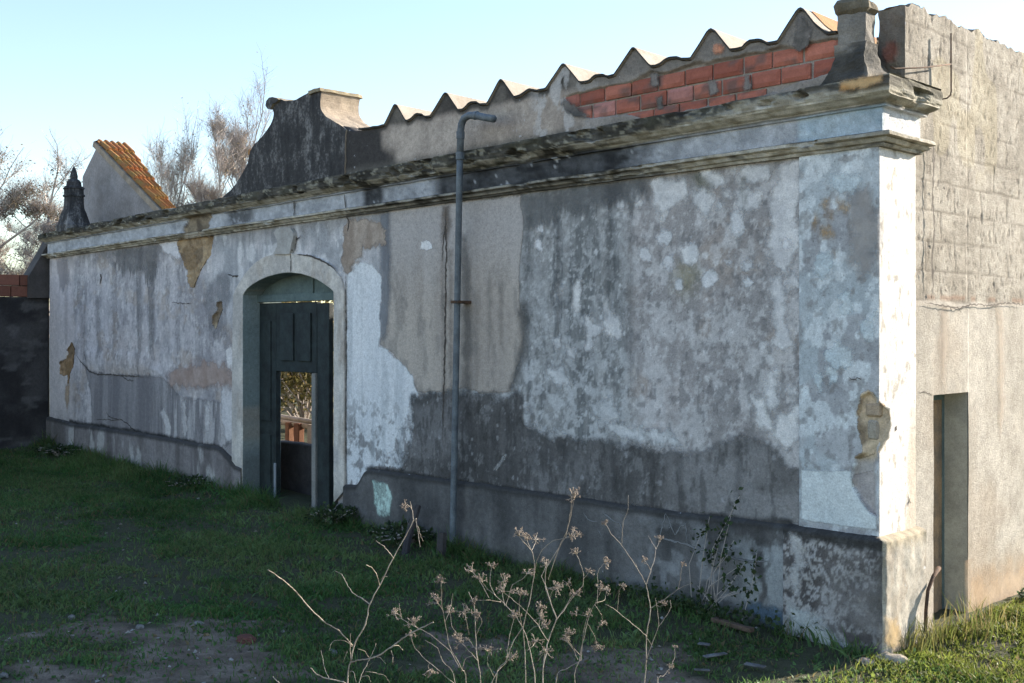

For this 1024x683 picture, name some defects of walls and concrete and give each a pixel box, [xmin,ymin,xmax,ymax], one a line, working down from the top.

flaking render [159,236,214,288]
crack [927,146,1023,310]
flaking render [212,302,223,329]
flaking render [59,342,75,384]
crack [75,353,144,381]
peeling [169,346,232,441]
peeling [341,218,418,515]
leakage [366,239,799,544]
flaking render [855,390,892,459]